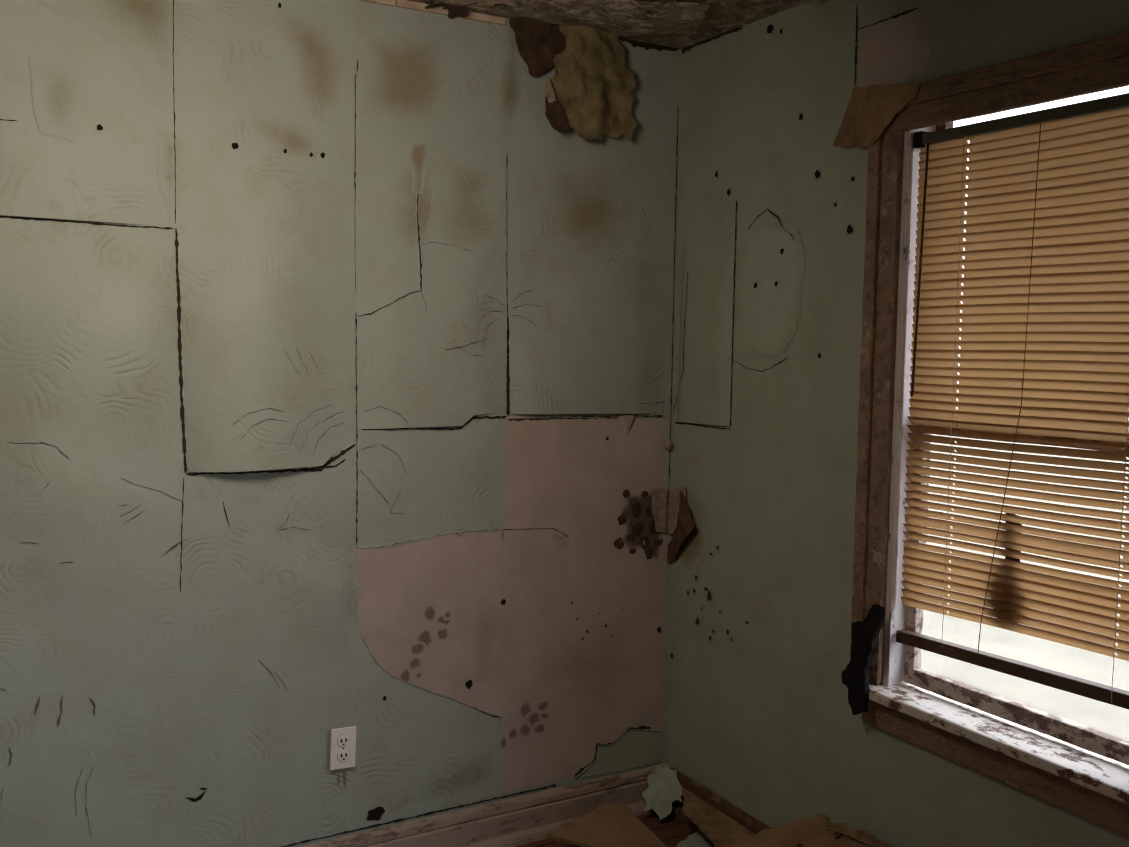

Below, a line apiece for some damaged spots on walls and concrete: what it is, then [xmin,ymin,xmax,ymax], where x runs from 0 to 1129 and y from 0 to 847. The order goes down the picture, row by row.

peeling [425,0,468,19]
peeling [553,0,709,35]
crack [0,0,510,592]
spalling [367,806,385,821]
peeling [354,415,669,794]
damp [374,583,674,822]